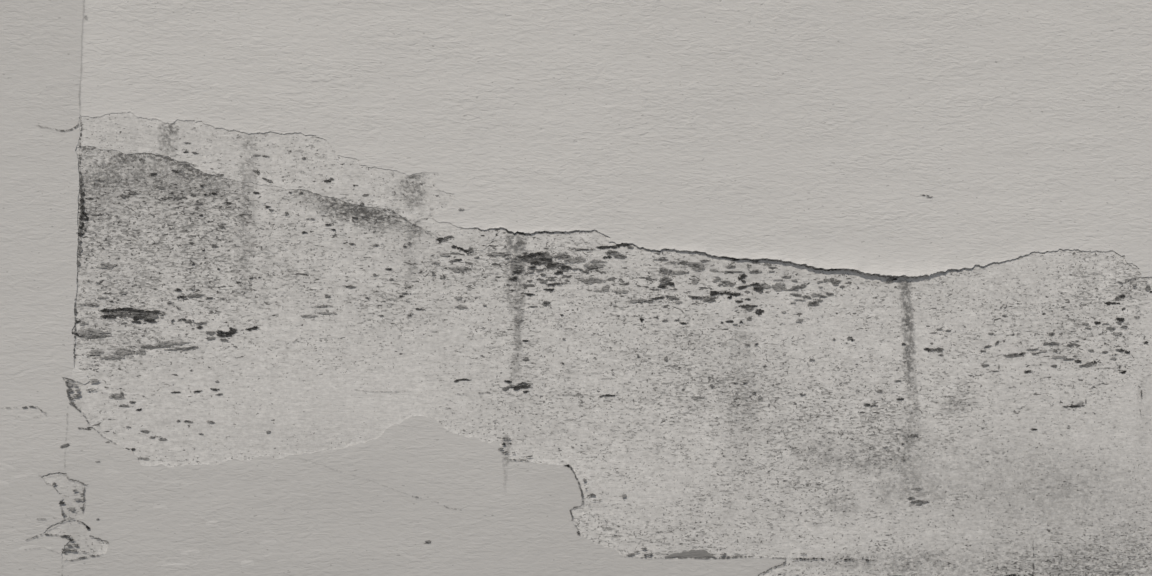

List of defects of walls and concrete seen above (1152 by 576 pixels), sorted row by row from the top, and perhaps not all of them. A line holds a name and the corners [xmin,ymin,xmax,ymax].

peeling [62,112,1152,576]
damp [900,281,916,389]
peeling [42,472,109,560]